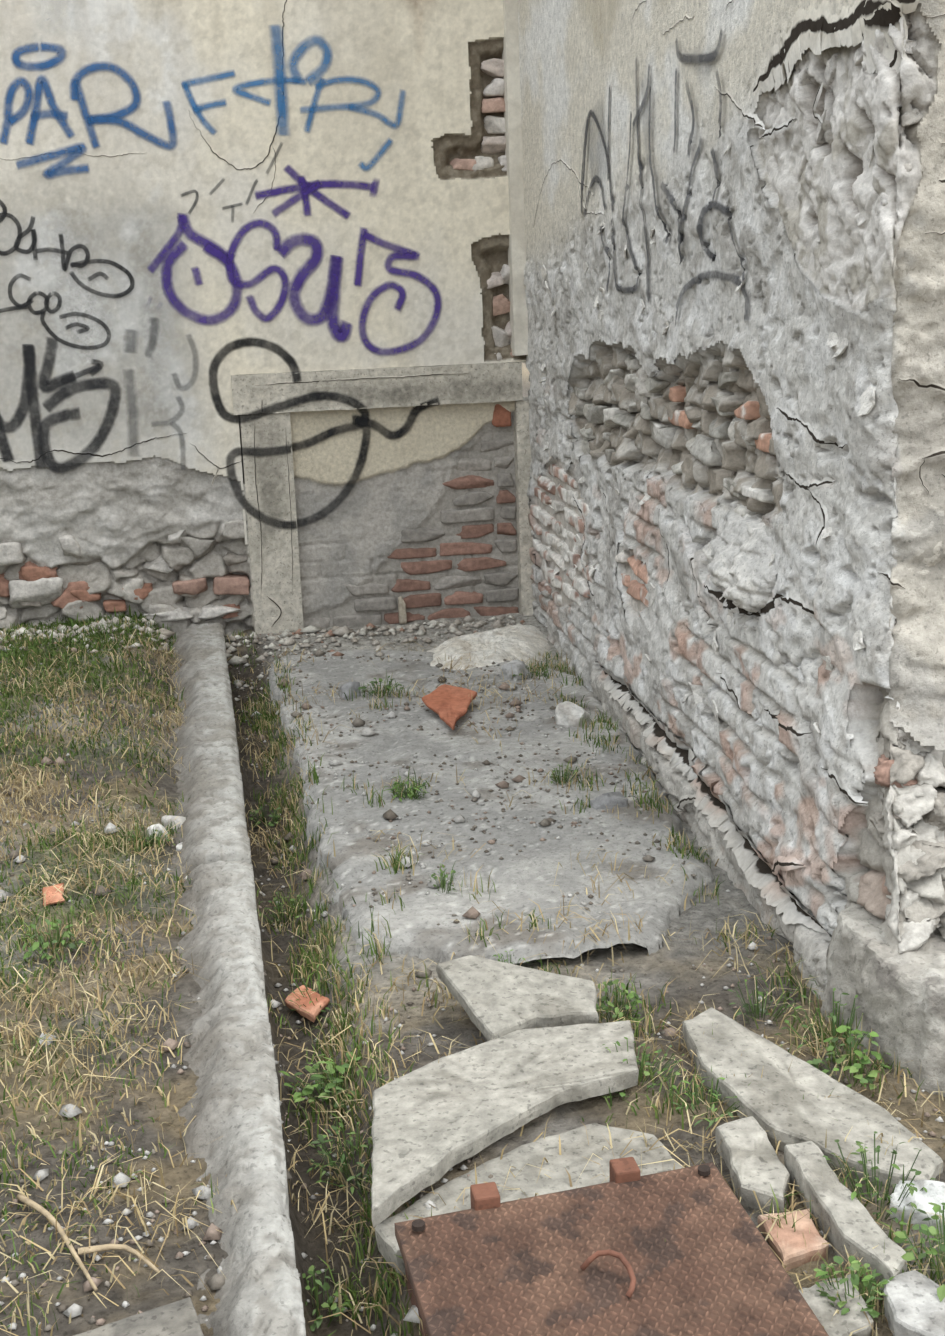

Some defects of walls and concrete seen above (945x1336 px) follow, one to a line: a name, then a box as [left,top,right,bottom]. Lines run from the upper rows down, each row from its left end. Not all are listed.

crack [189,0,287,212]
flaking render [431,37,508,180]
crack [714,0,945,140]
spalling [747,3,942,317]
flaking render [471,233,547,383]
crack [898,377,945,394]
flaking render [0,455,255,638]
flaking render [333,339,789,627]
crack [776,407,849,550]
crack [877,570,905,589]
crack [917,449,945,495]
flaking render [833,682,945,954]